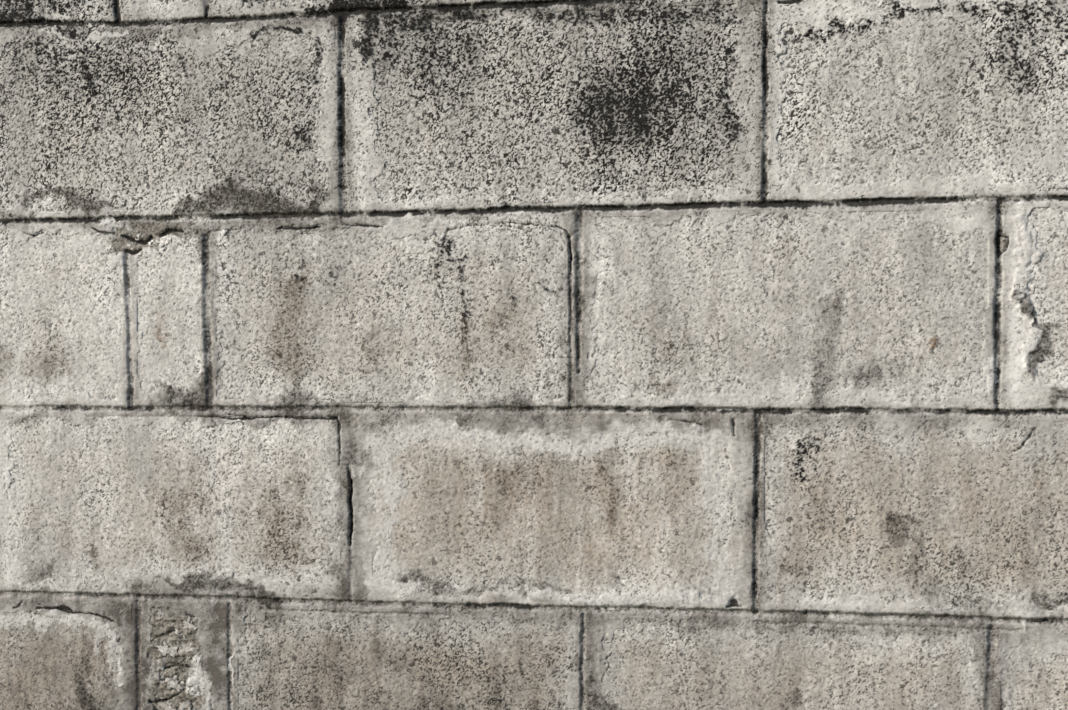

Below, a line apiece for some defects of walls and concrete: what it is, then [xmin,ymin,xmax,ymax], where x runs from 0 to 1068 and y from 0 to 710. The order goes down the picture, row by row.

mould [249,0,744,164]
spalling [107,221,192,256]
crack [13,602,114,621]